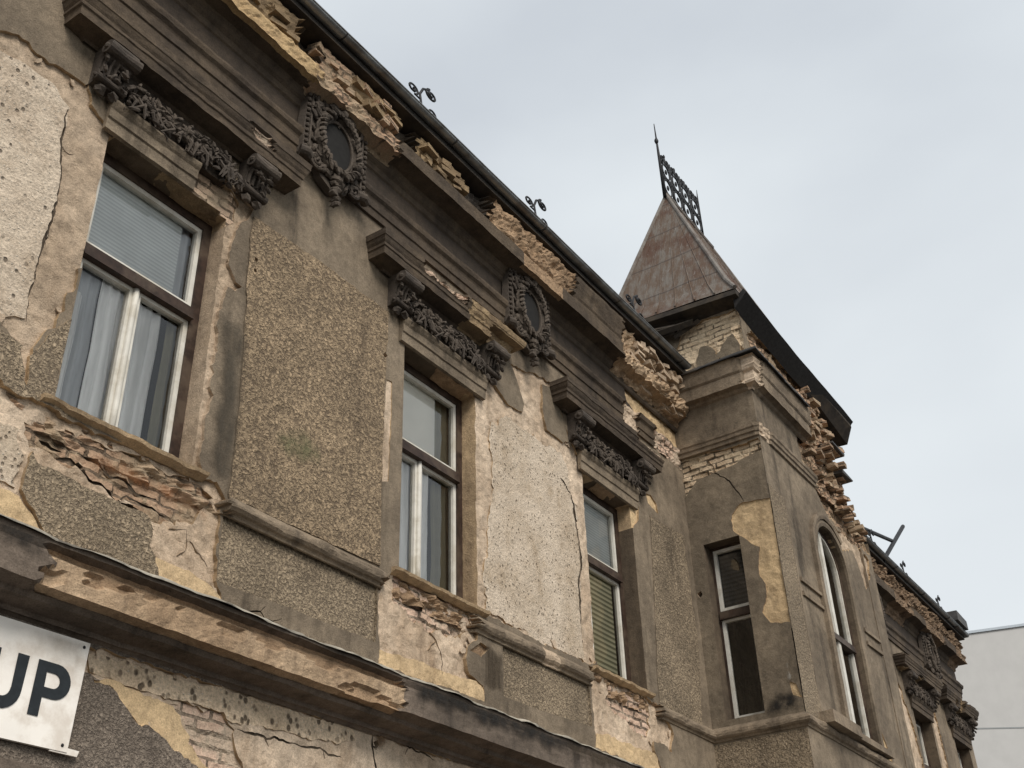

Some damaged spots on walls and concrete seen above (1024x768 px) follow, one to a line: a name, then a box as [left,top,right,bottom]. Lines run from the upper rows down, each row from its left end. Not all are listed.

flaking render [222,0,399,135]
crack [26,109,73,320]
flaking render [0,30,253,599]
flaking render [378,361,674,768]
crack [561,479,583,643]
crack [701,461,744,501]
flaking render [624,309,870,589]
flaking render [731,498,790,623]
flaking render [84,647,475,768]
crack [238,729,342,758]